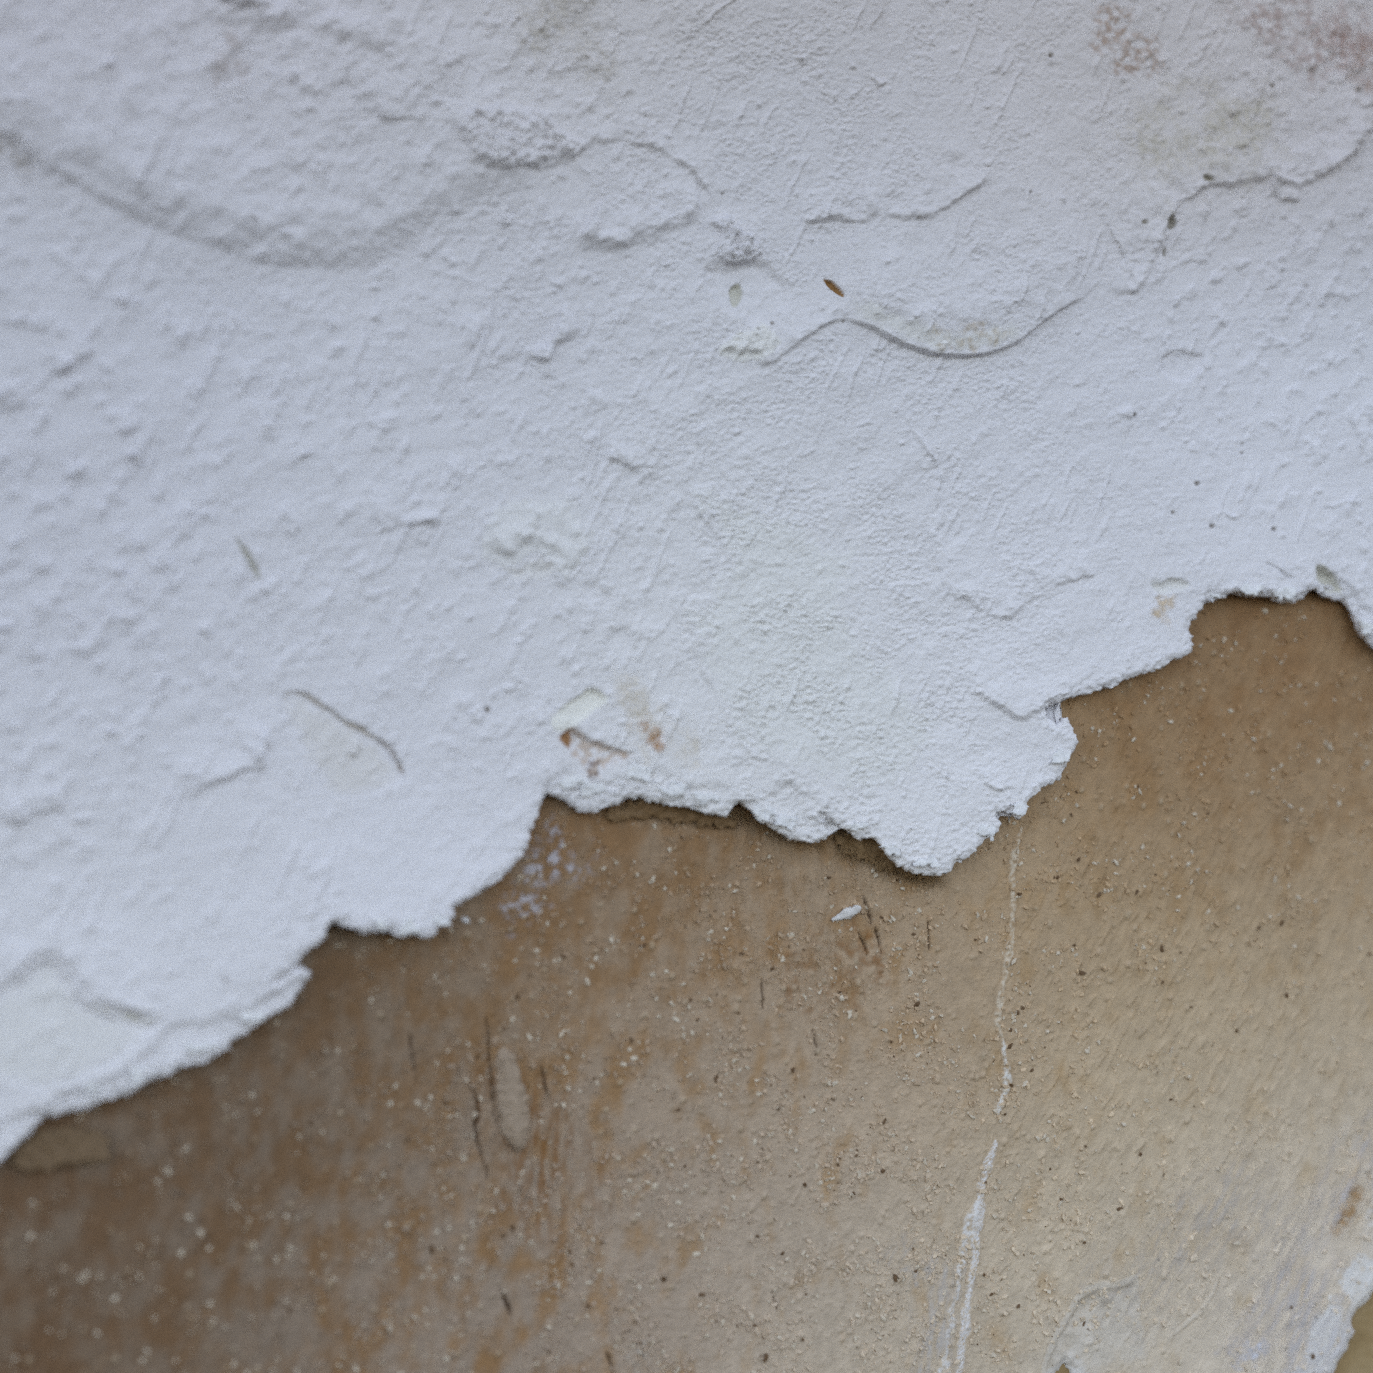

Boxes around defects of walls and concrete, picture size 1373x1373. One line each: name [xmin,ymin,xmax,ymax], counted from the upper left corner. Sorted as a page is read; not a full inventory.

peeling [1358,619,1373,635]
spalling [280,691,407,804]
spalling [550,687,688,797]
peeling [1051,748,1072,764]
peeling [752,803,798,831]
peeling [1011,800,1029,816]
peeling [976,822,997,841]
peeling [879,843,942,868]
peeling [373,913,451,938]
peeling [832,905,861,922]
peeling [239,1007,267,1026]
peeling [7,1124,112,1174]